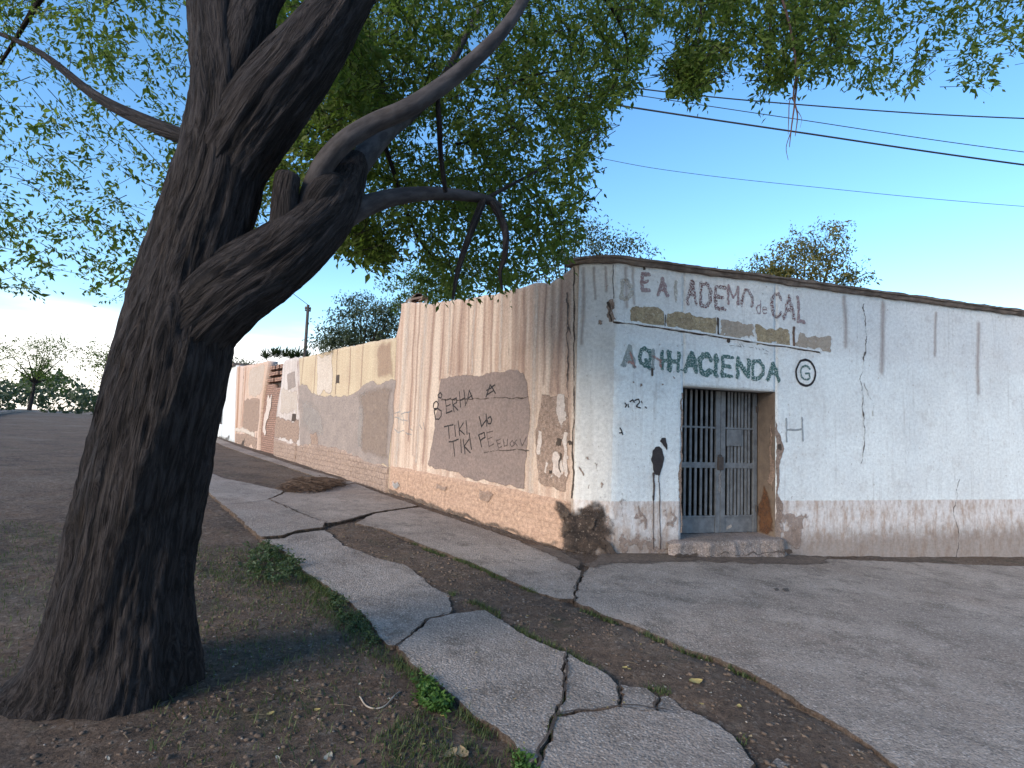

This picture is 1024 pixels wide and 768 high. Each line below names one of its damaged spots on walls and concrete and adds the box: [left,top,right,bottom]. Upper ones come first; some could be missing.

flaking render [235,372,396,467]
flaking render [428,370,597,502]
flaking render [630,306,831,352]
crack [860,304,868,463]